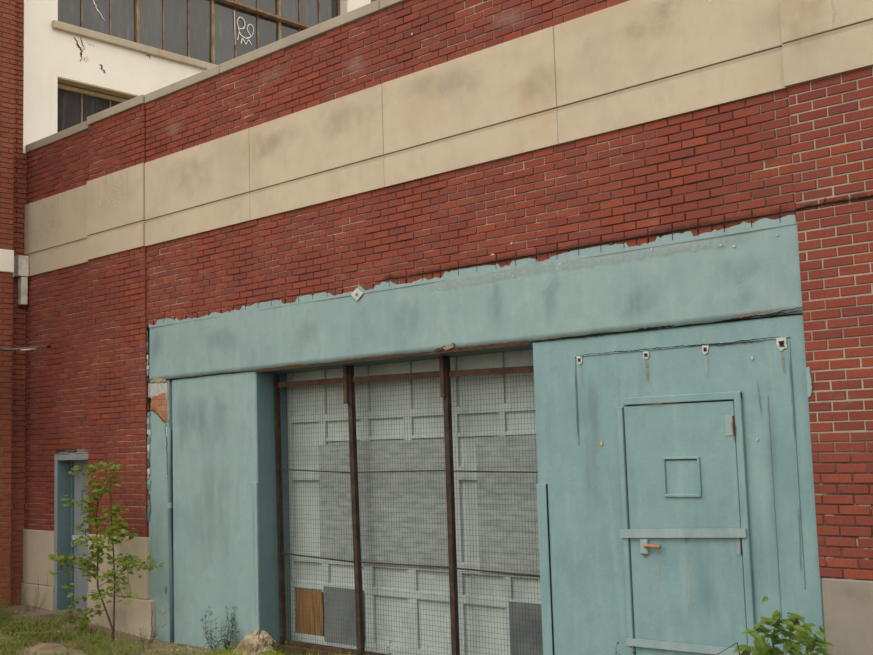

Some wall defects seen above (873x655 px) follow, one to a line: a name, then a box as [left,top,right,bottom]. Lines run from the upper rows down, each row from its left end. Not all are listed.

crack [391,195,873,279]
spalling [430,343,460,354]
peeling [146,331,169,520]